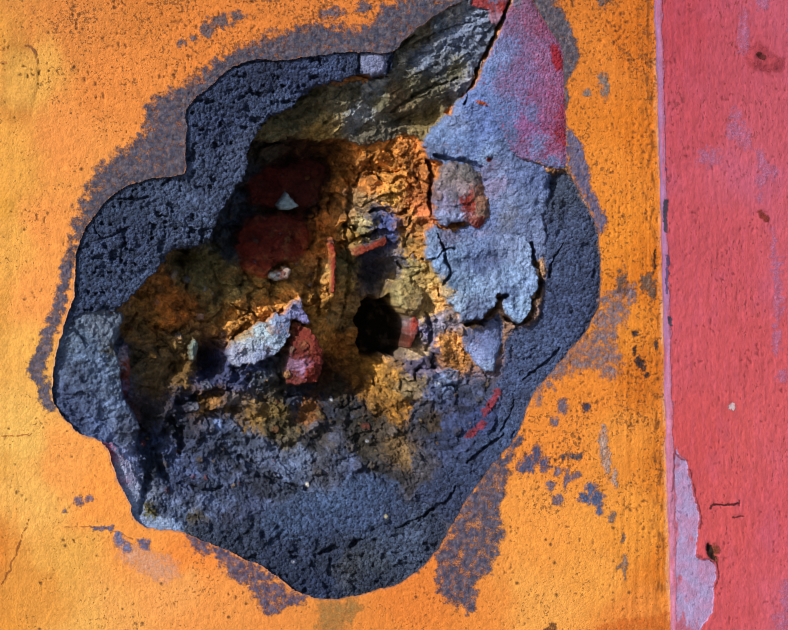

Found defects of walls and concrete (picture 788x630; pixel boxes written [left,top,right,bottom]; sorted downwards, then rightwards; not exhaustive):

peeling [583,72,610,97]
spalling [52,0,600,599]
peeling [616,264,627,292]
peeling [640,0,719,630]
peeling [516,446,616,523]